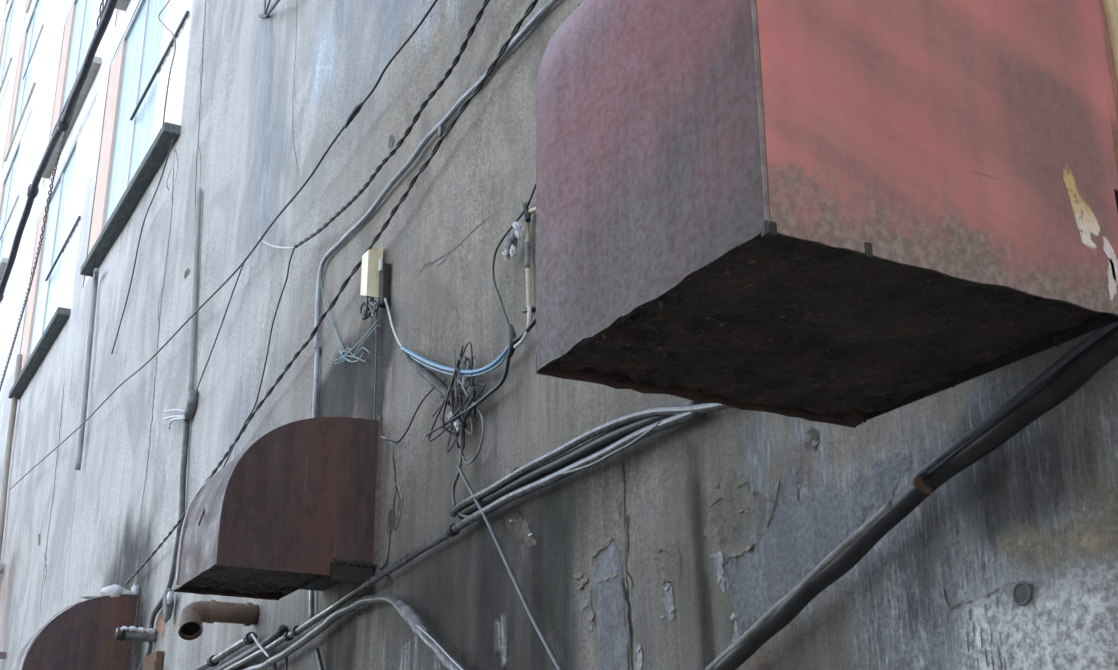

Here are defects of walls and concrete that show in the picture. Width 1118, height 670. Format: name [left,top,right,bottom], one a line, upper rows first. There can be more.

peeling [572,538,643,670]
crack [619,462,633,670]
peeling [654,548,678,621]
peeling [709,551,725,592]